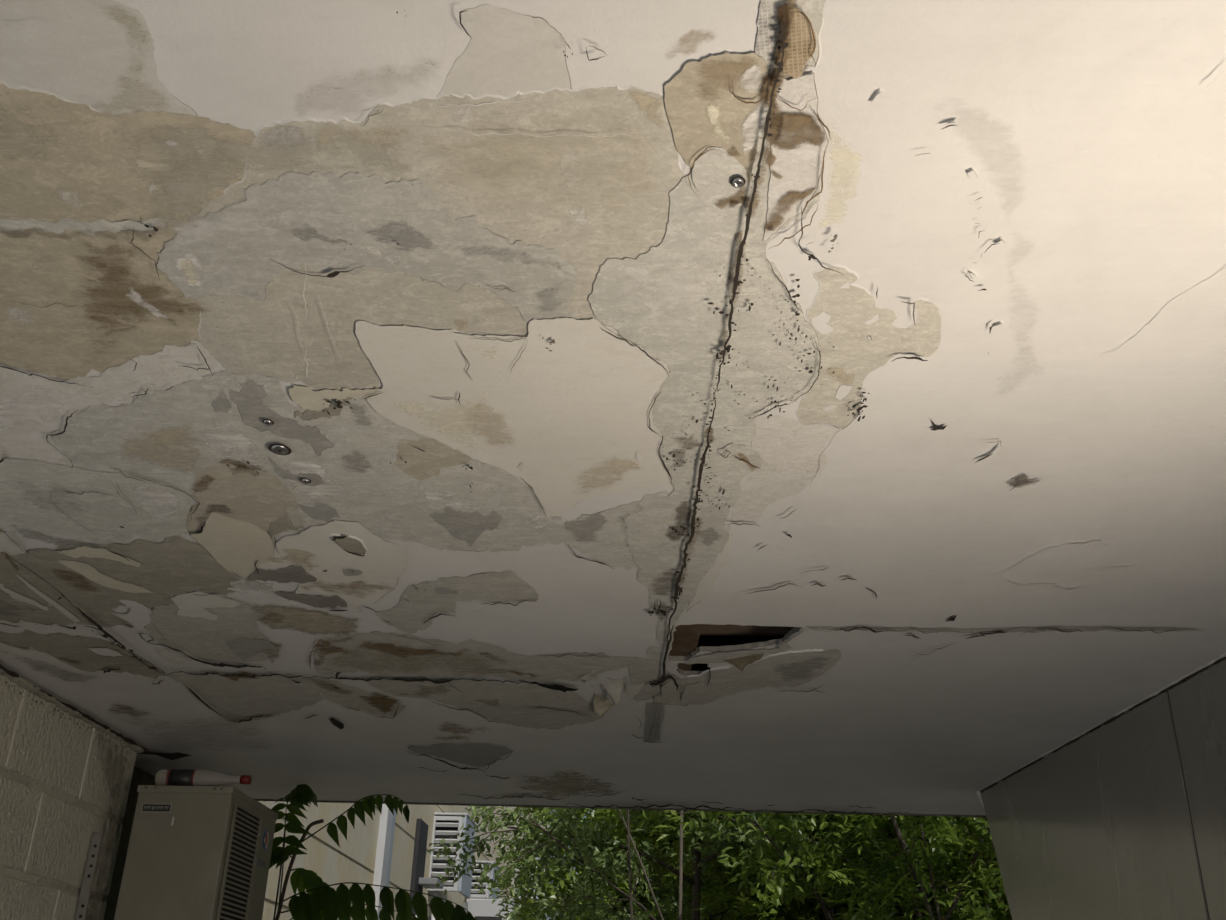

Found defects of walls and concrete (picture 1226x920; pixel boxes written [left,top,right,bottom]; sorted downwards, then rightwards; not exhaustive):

damp [664,0,858,248]
crack [798,206,842,274]
peeling [0,0,942,729]
crack [601,0,801,695]
crack [752,337,821,419]
crack [10,557,578,716]
crack [746,568,1206,659]
peeling [407,743,513,779]
crack [980,657,1226,793]